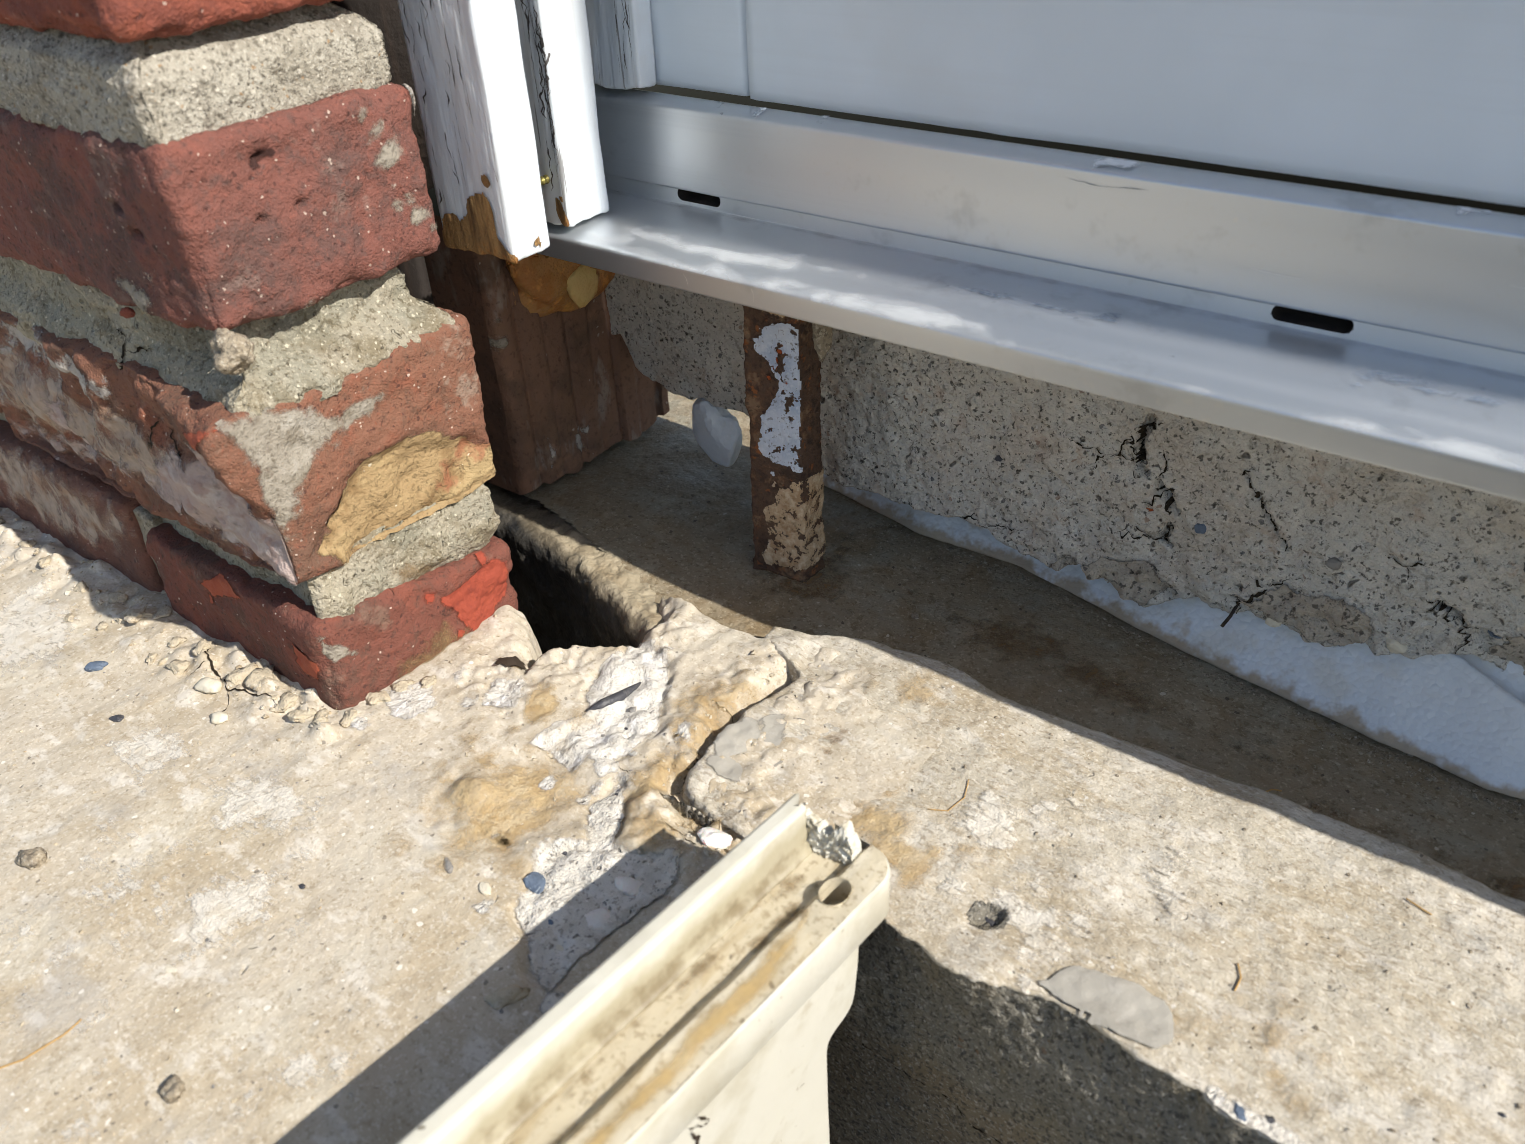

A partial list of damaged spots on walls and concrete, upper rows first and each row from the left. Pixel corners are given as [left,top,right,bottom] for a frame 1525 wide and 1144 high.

spalling [514,640,690,1015]
spalling [967,900,1011,931]
spalling [1206,1086,1302,1144]